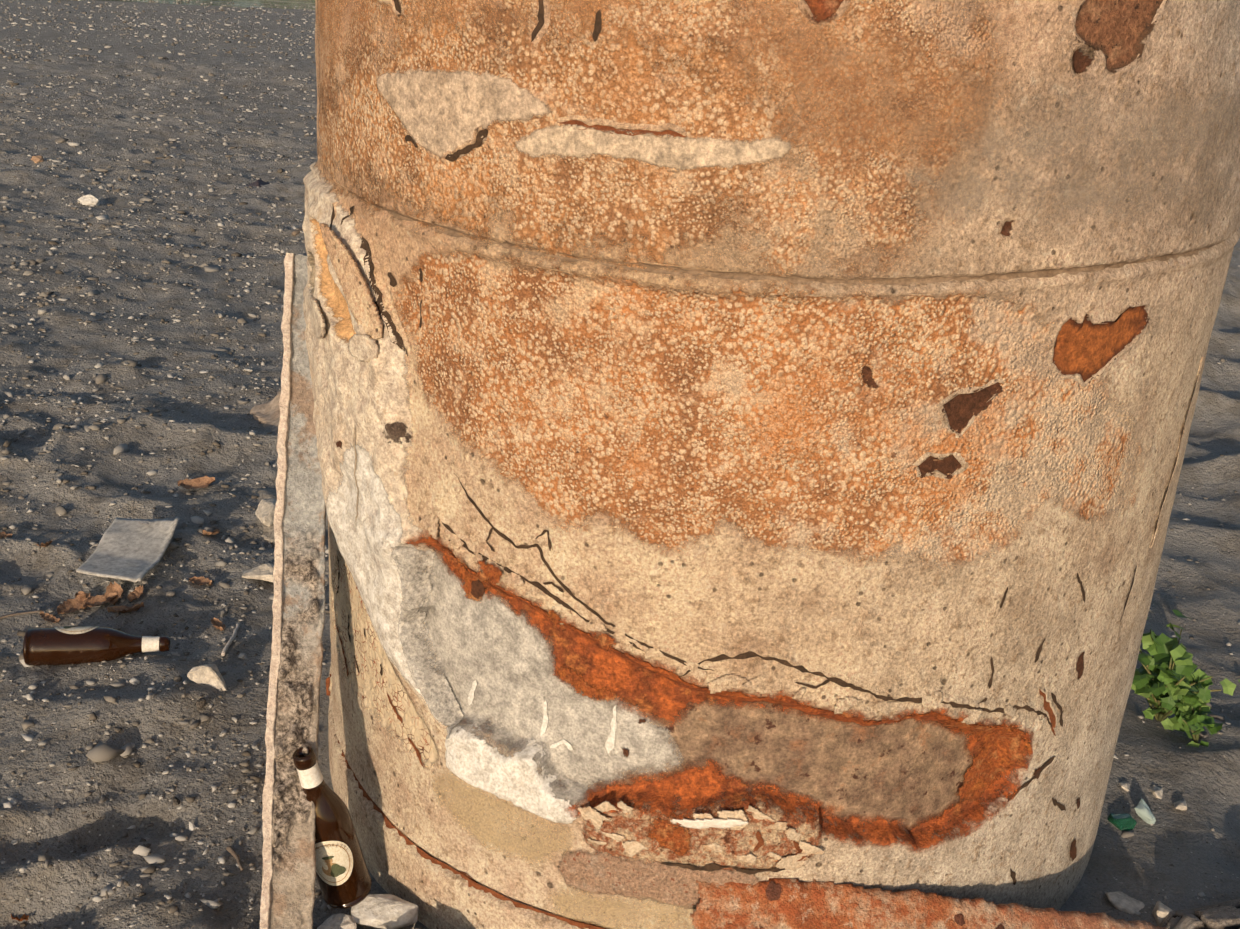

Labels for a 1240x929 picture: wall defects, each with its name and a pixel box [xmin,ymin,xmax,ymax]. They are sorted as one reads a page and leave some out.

crack [531,0,550,45]
crack [592,10,602,42]
peeling [377,70,792,170]
rust [316,0,1142,568]
crack [433,470,1066,811]
peeling [391,511,825,910]
rust [407,532,1033,852]
peeling [834,696,899,714]
peeling [921,690,943,710]
peeling [959,708,983,724]